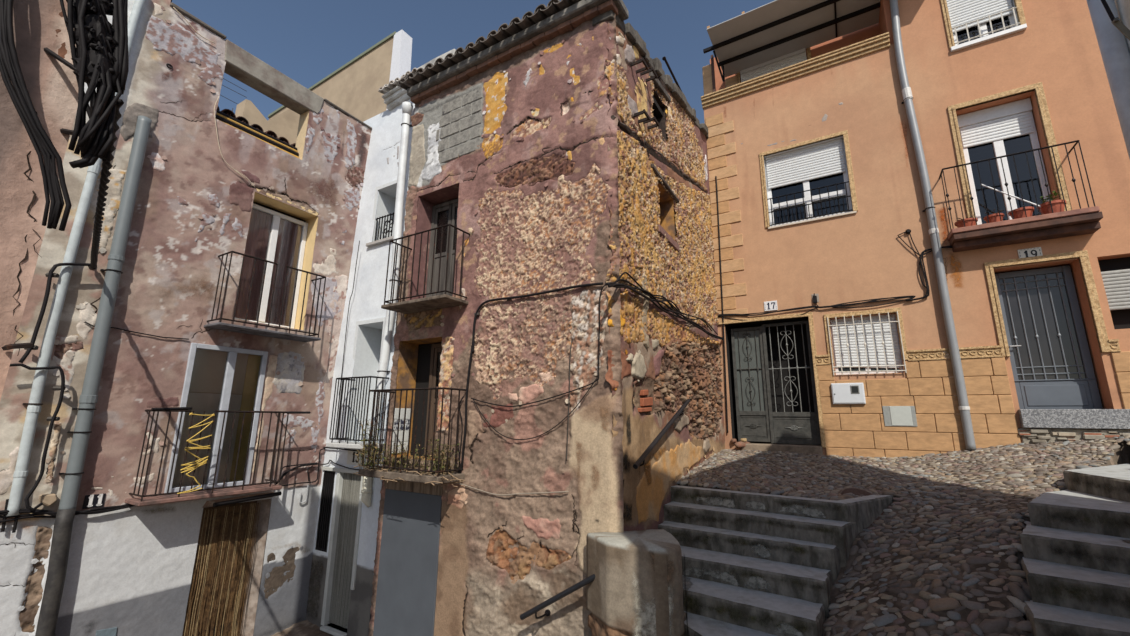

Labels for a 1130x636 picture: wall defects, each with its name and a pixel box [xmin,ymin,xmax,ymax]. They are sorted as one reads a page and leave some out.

peeling [147,152,167,171]
crack [159,100,211,122]
peeling [305,108,364,211]
peeling [410,108,442,182]
peeling [195,171,318,242]
crack [13,144,42,356]
spalling [459,32,724,524]
spalling [404,309,455,431]
peeling [445,485,468,509]
spalling [18,526,53,636]
spalling [264,546,303,599]
spalling [486,516,571,584]